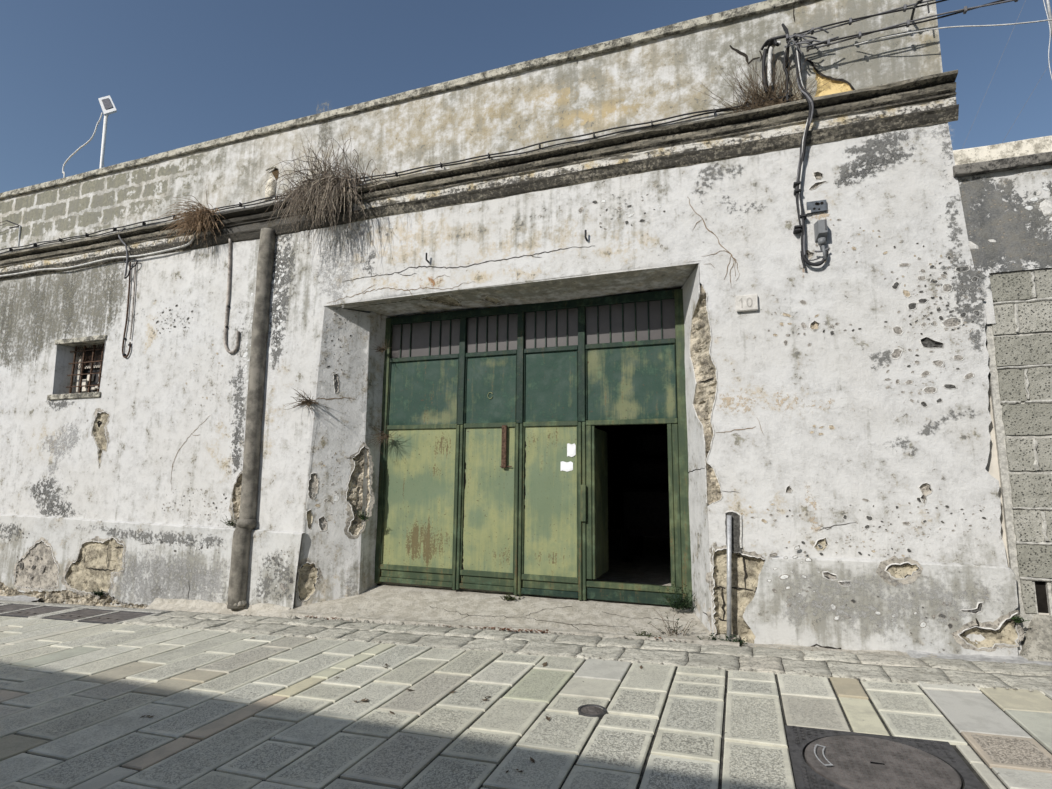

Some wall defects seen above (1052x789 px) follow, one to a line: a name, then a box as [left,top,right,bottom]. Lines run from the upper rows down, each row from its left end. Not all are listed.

water stain [0,261,126,365]
water stain [270,233,295,369]
crack [329,246,591,309]
flaking render [79,372,119,468]
flaking render [689,284,723,505]
water stain [30,423,80,517]
flaking render [162,471,242,528]
flaking render [306,442,375,539]
flaking render [0,527,148,609]
flaking render [267,550,323,602]
flaking render [703,482,987,643]
flaking render [874,602,1025,652]